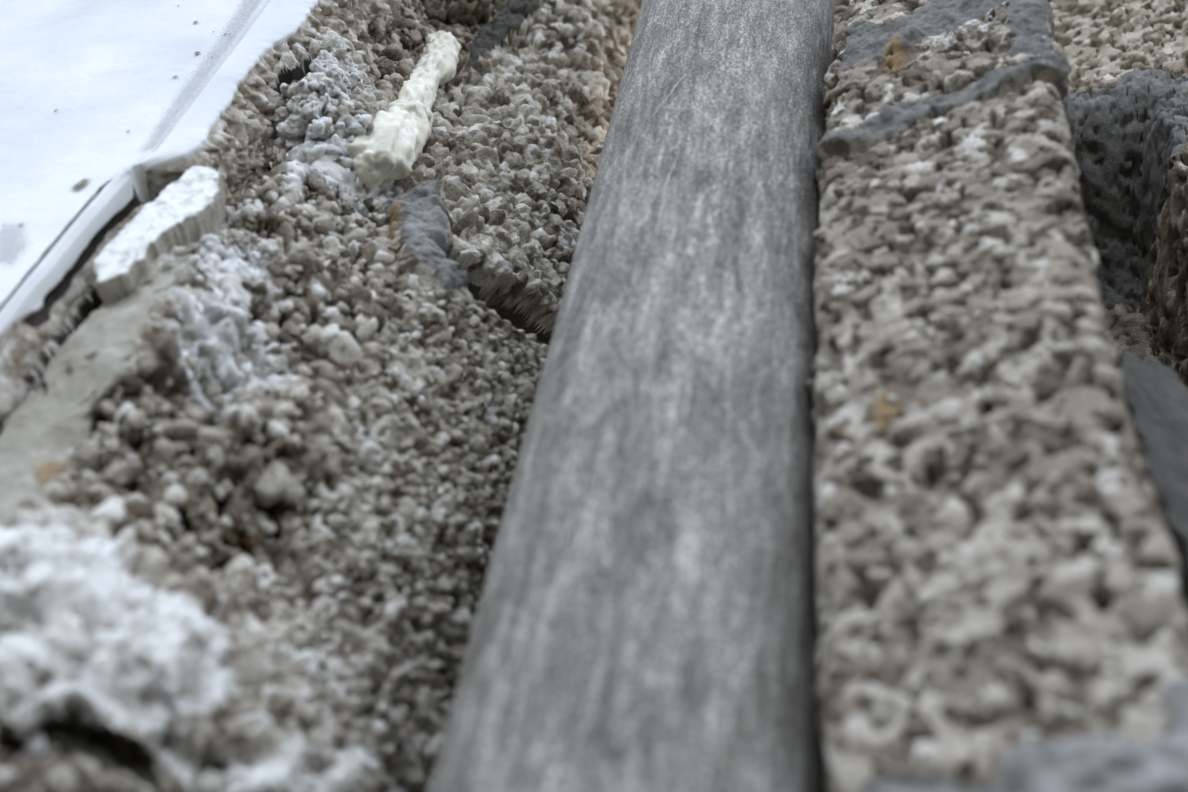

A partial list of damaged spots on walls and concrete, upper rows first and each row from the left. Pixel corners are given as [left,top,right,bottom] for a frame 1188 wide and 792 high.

spalling [368,0,506,101]
spalling [41,160,397,642]